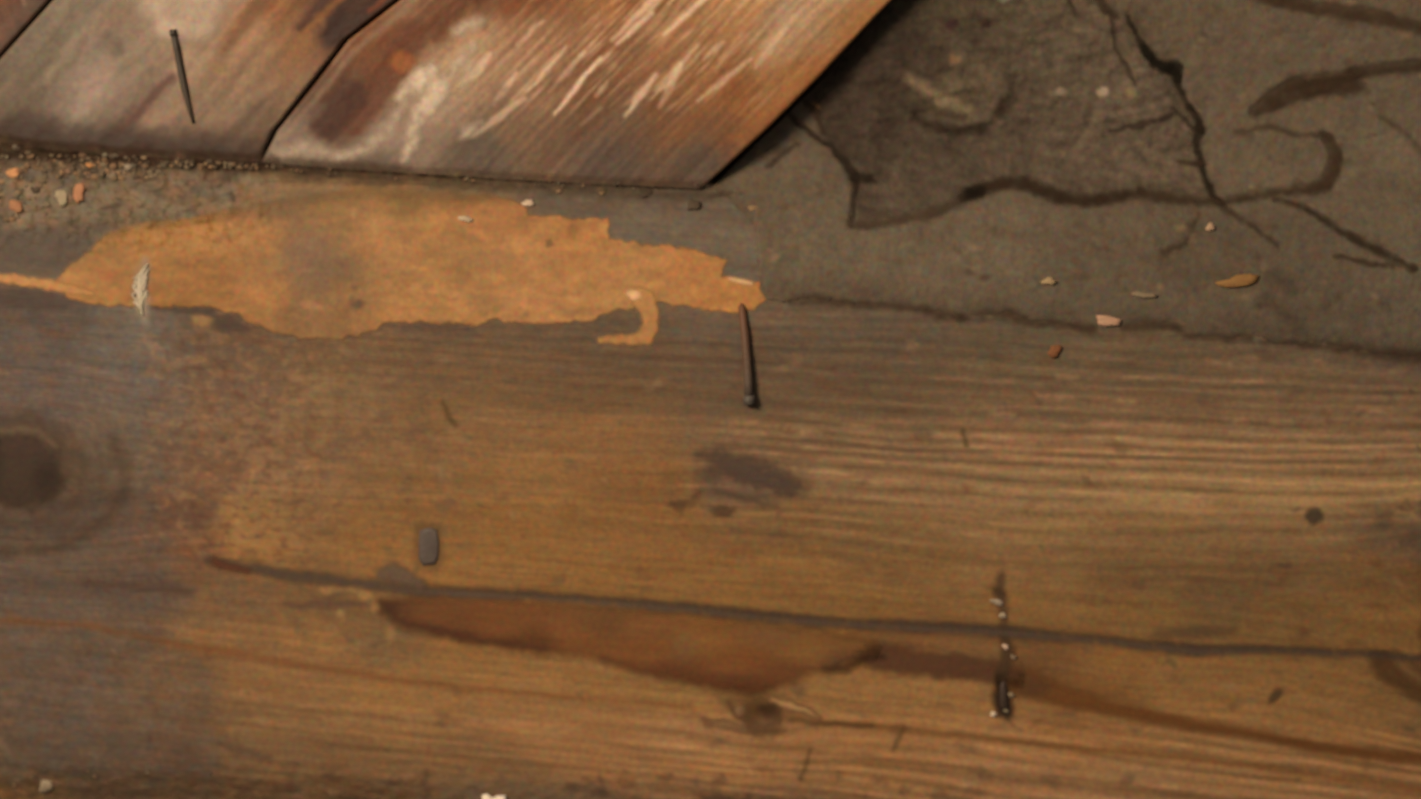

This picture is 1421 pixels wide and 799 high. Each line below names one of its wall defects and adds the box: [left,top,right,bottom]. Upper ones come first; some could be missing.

crack [766,0,1421,271]
peeling [0,189,766,345]
leakage [709,453,797,494]
crack [208,559,1421,659]
leakage [379,597,1421,761]